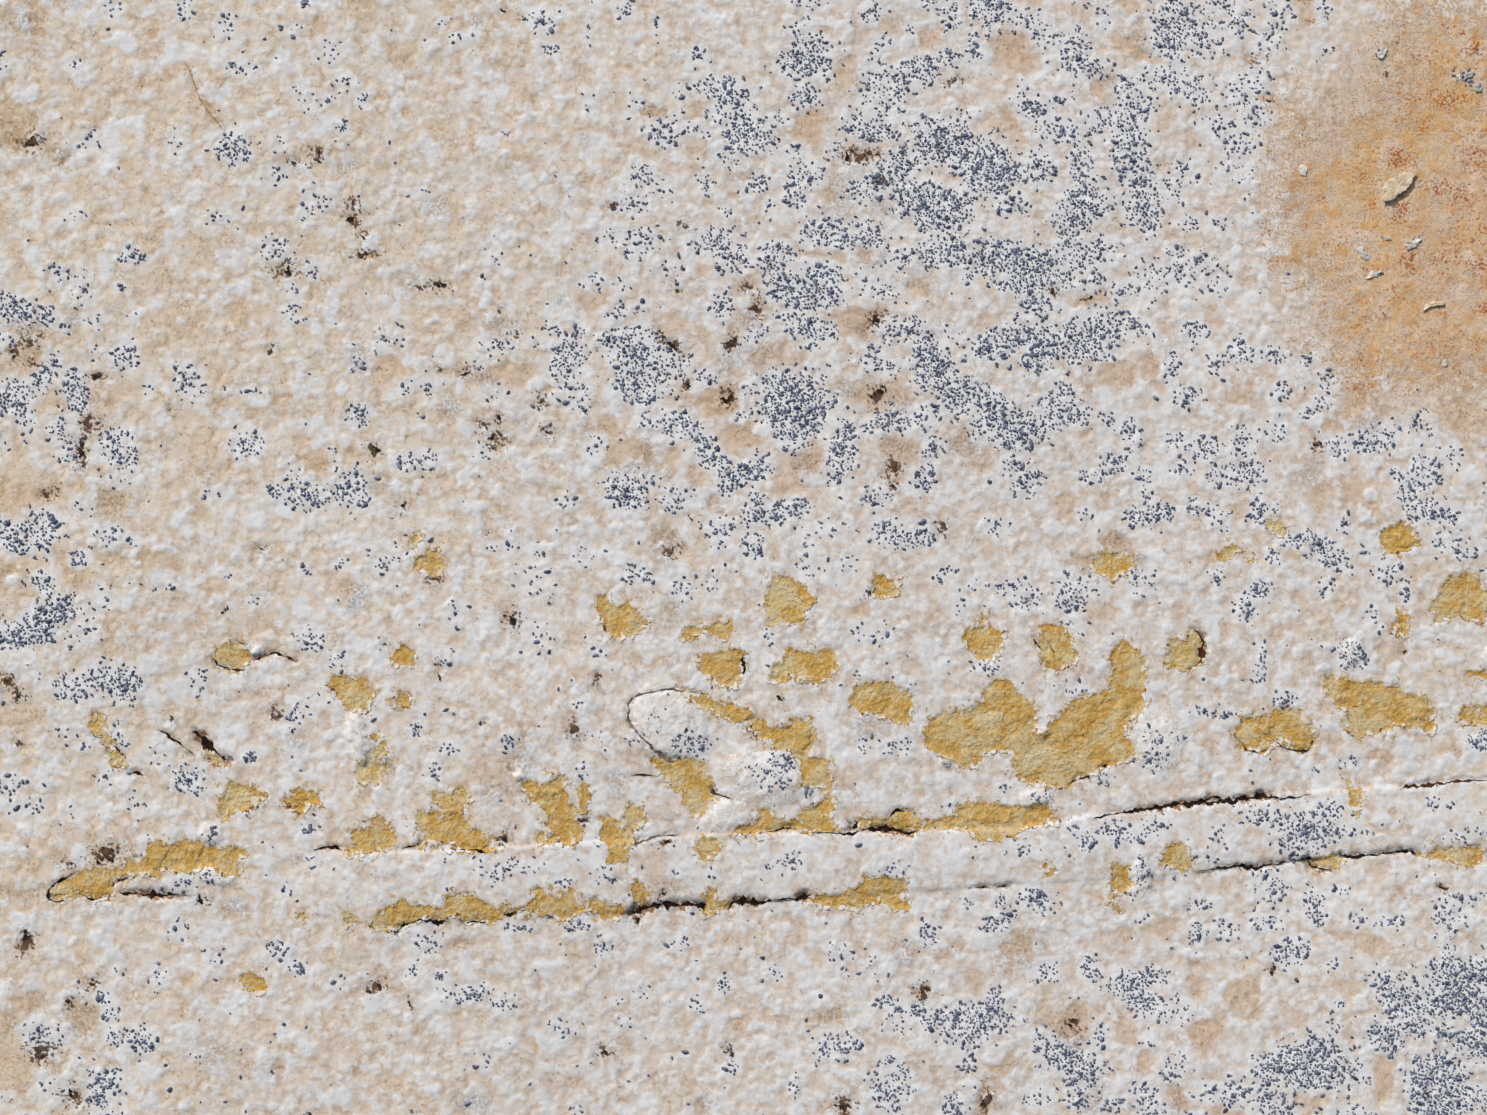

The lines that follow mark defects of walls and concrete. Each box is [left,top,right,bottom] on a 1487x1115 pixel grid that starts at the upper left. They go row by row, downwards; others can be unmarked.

corrosion [1237,0,1487,431]
spalling [1388,563,1487,647]
crack [160,729,233,766]
spalling [647,571,1209,864]
spalling [1319,665,1487,744]
spalling [43,746,325,910]
spalling [294,763,653,935]
crack [628,893,811,927]
crack [768,808,918,839]
spalling [804,873,914,917]
crack [1094,792,1306,818]
crack [1199,847,1416,873]